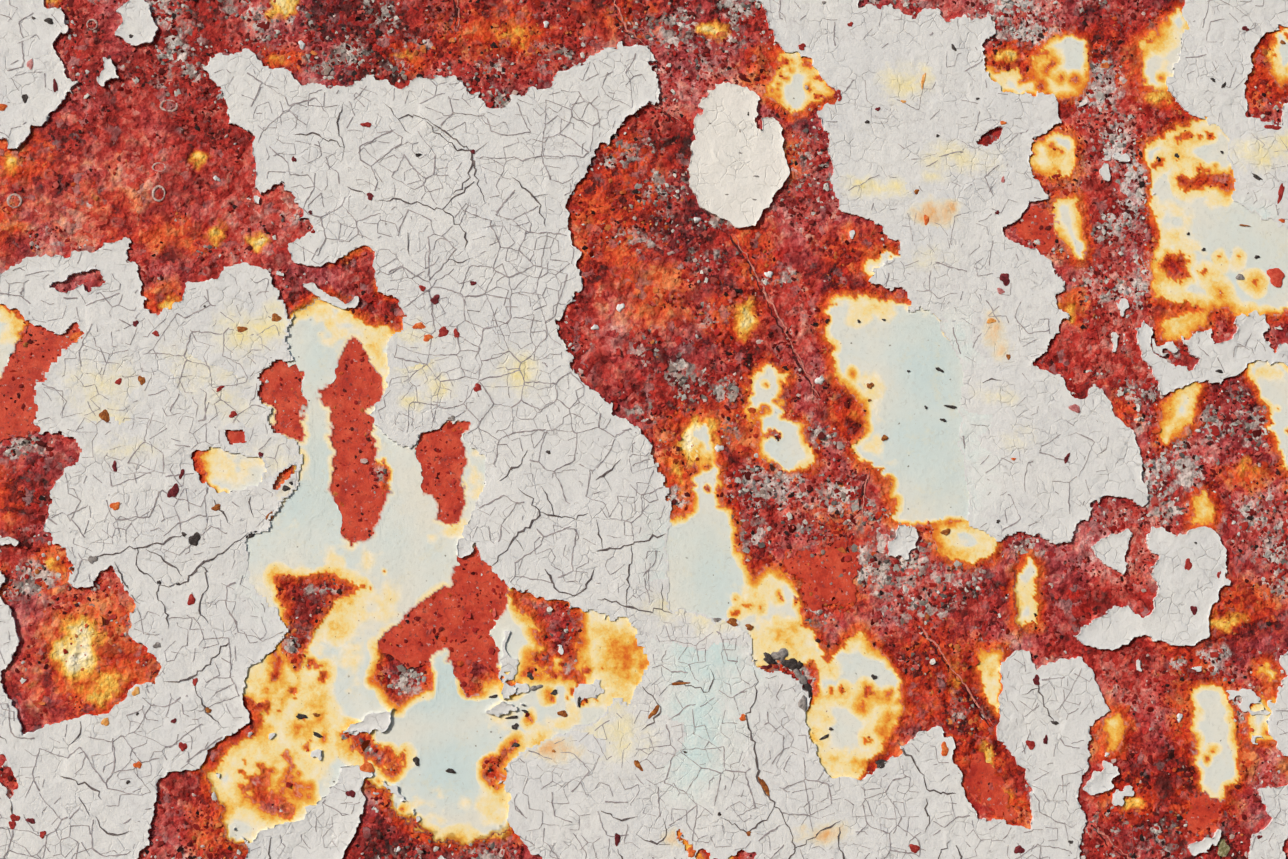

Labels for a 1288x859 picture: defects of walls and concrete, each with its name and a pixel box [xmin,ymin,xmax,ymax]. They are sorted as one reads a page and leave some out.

crack [0,0,61,138]
crack [1186,0,1288,122]
corrosion [412,322,460,342]
crack [827,20,1145,536]
corrosion [997,273,1010,294]
corrosion [1254,255,1285,287]
peeling [0,0,807,859]
crack [214,53,1094,859]
peeling [555,0,1288,859]
crack [0,249,290,859]
corrosion [713,618,754,631]
corrosion [1026,721,1059,750]